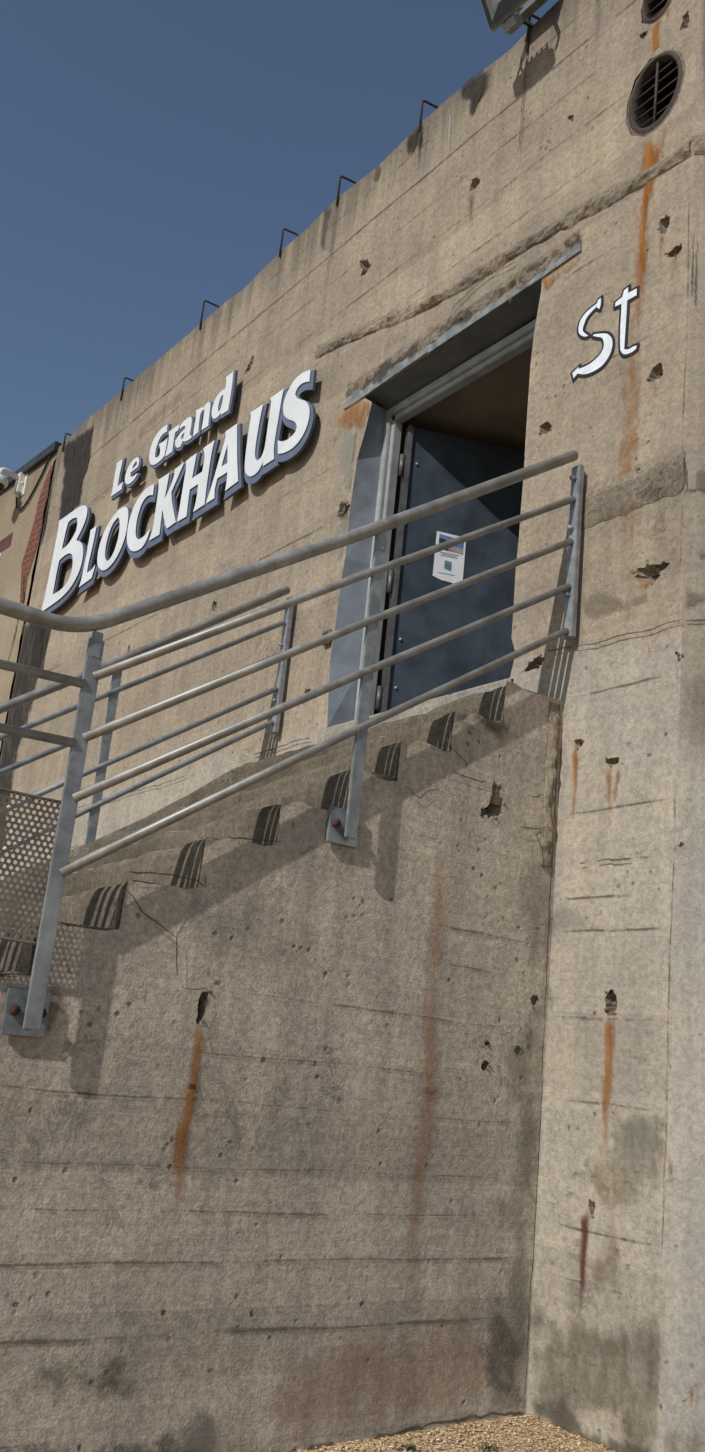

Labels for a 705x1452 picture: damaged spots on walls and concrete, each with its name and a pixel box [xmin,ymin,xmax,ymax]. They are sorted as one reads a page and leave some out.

rust [639,142,662,282]
spalling [632,561,670,586]
spalling [480,781,506,820]
rust [175,1033,201,1168]
rust [603,1022,612,1110]